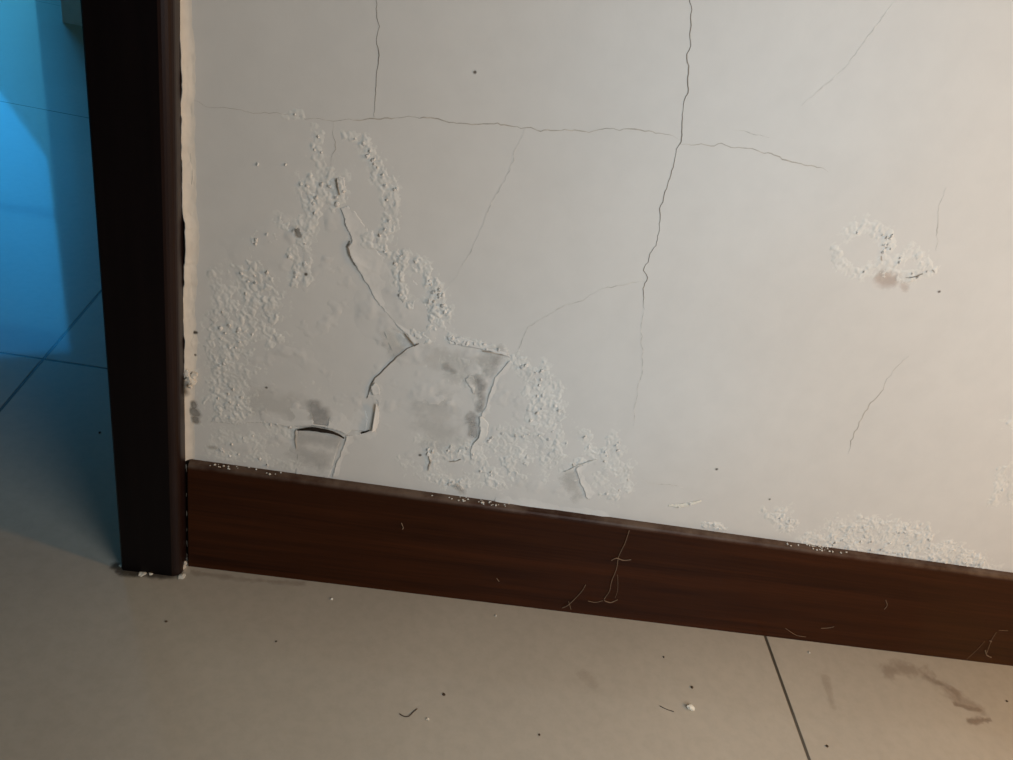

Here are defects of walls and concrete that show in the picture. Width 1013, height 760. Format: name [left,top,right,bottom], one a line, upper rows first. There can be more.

flaking render [183,369,200,424]
peeling [211,206,635,517]
crack [202,0,828,419]
crack [850,362,902,447]